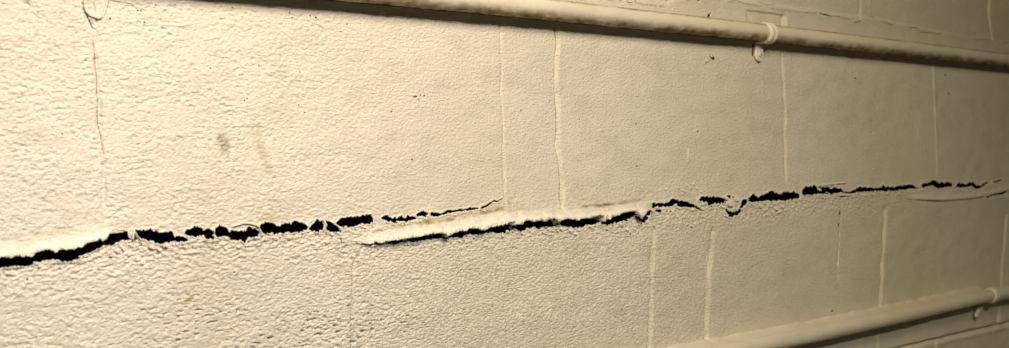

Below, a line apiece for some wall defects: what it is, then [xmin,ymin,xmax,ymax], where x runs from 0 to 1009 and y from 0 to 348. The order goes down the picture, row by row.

crack [86,15,108,163]
crack [553,29,561,203]
crack [0,178,1009,348]